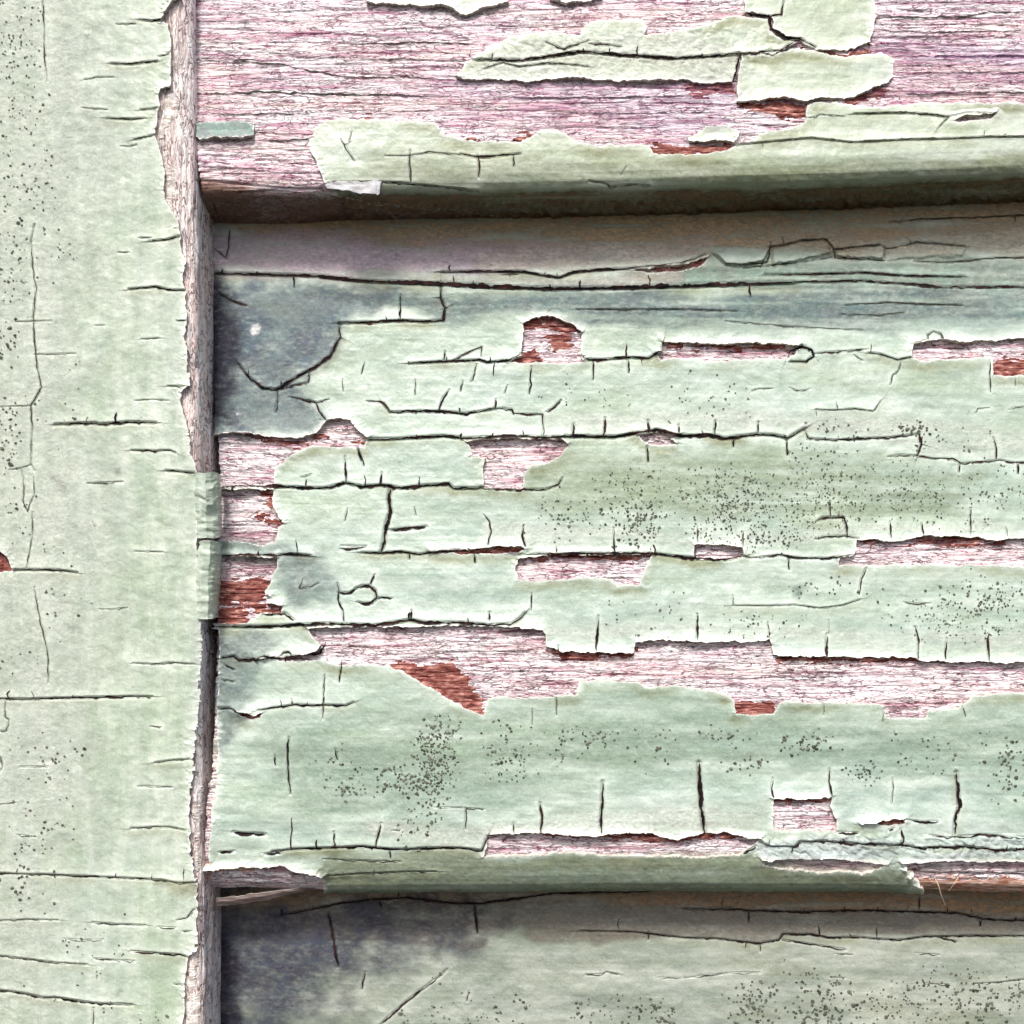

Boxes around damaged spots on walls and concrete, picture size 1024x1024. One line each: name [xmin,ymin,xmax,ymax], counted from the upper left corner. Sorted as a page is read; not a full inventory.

peeling [195,0,1024,223]
damp [214,279,1024,436]
crack [0,226,151,732]
peeling [149,0,373,1024]
peeling [459,432,575,494]
crack [212,214,1024,717]
peeling [250,615,1024,723]
crack [219,739,649,966]
peeling [475,770,1024,895]
crack [744,773,1024,854]
damp [220,900,462,1024]
damp [570,994,675,1024]